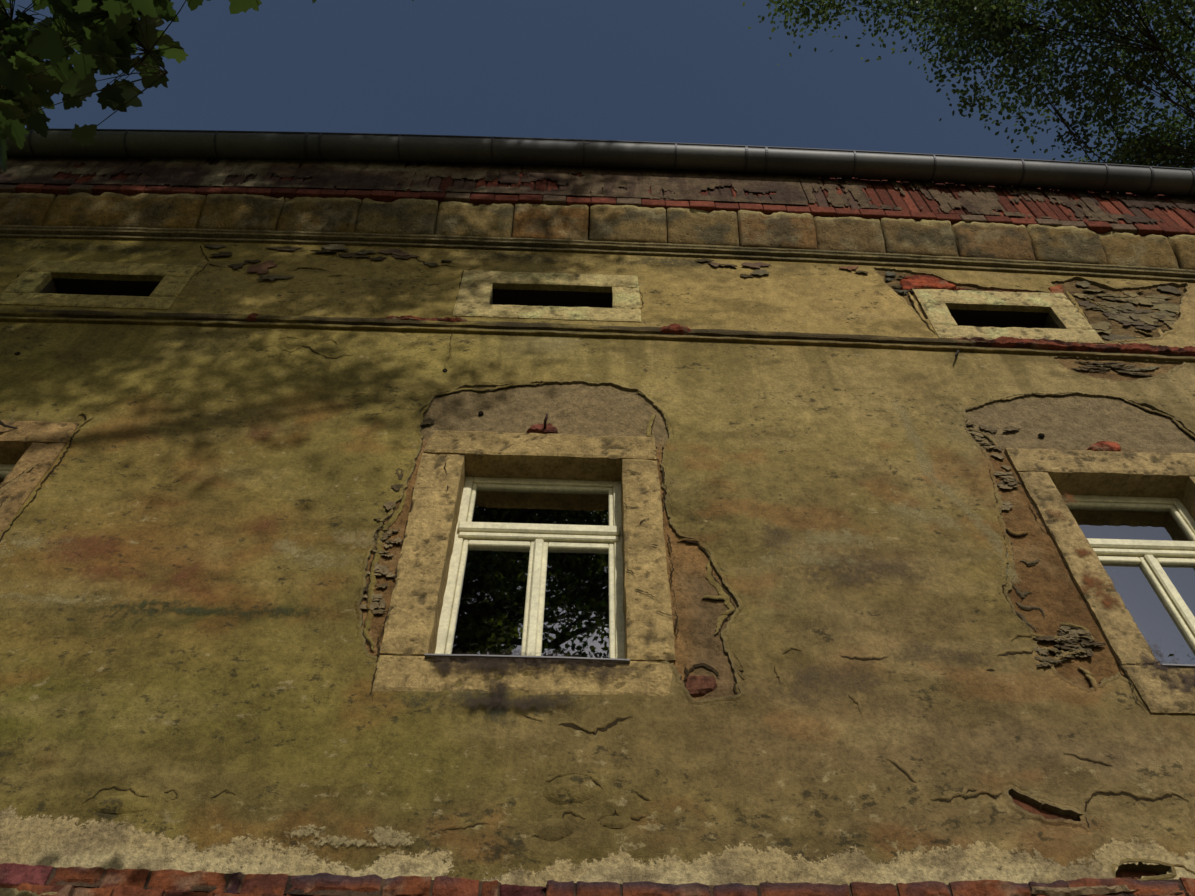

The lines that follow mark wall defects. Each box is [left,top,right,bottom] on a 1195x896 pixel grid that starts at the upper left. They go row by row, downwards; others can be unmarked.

peeling [204,244,452,281]
spalling [839,266,1195,693]
spalling [354,379,746,705]
crack [524,714,633,735]
crack [1063,752,1189,830]
spalling [1111,858,1177,881]